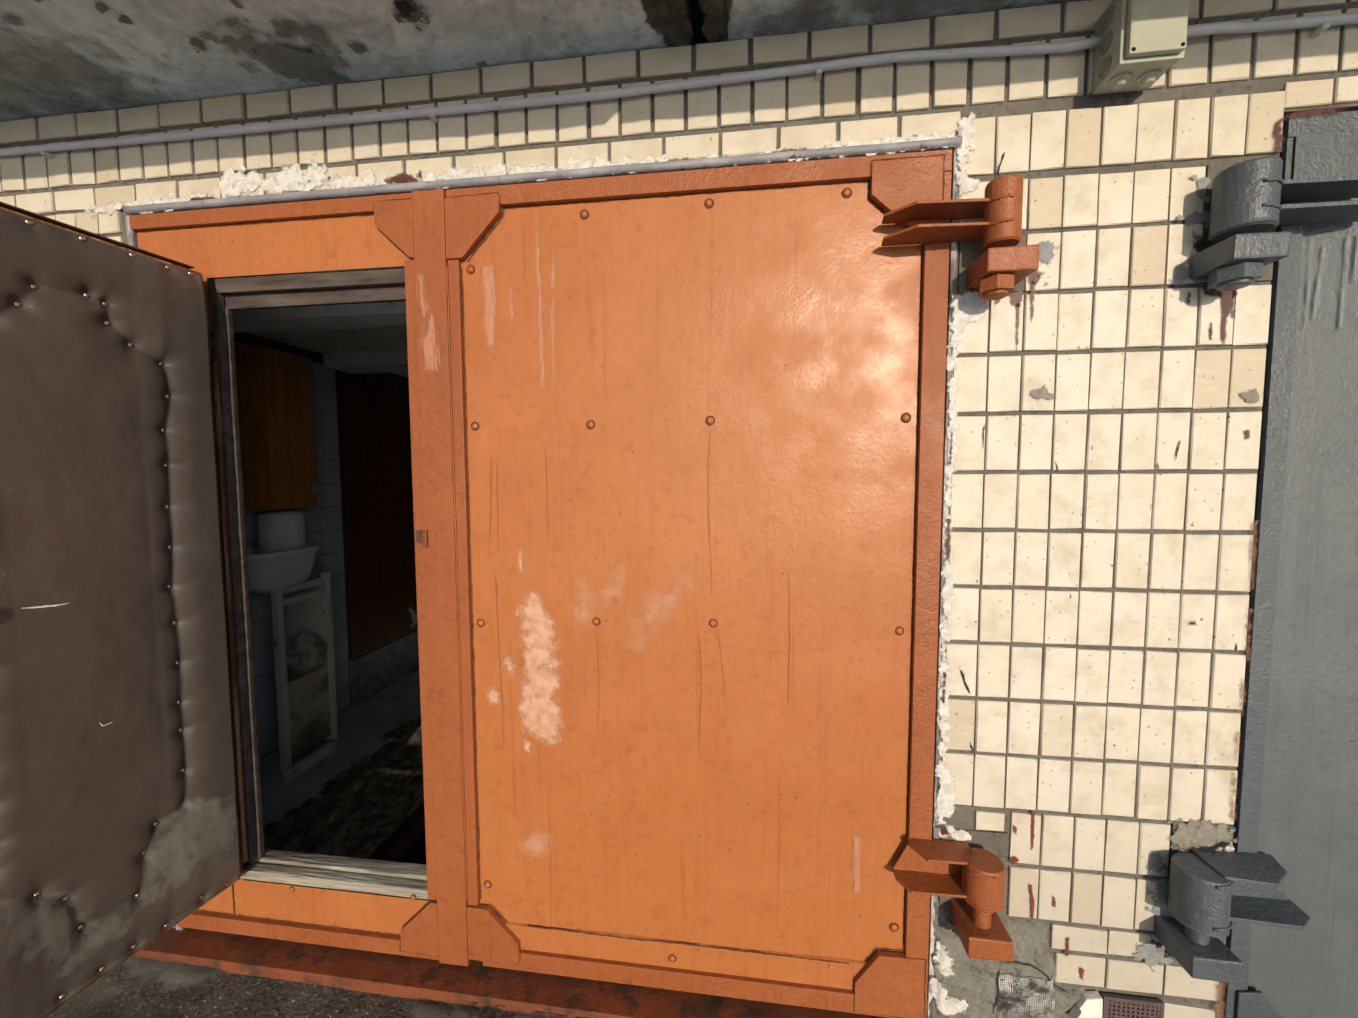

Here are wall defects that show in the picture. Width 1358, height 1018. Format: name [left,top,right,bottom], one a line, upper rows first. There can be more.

leakage [0,16,147,119]
leakage [95,2,133,24]
leakage [189,0,369,86]
crack [722,0,730,42]
peeling [930,941,968,1015]
spalling [1069,990,1103,1018]